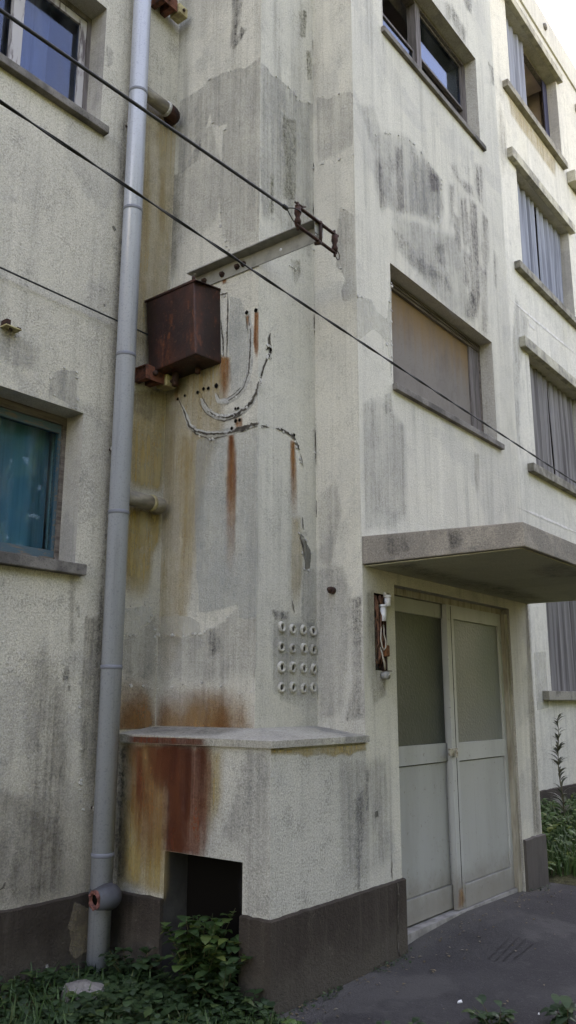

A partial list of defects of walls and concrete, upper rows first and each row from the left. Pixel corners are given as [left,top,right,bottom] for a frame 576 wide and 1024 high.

leakage [451,193,485,316]
crack [177,293,316,468]
corrosion [247,313,258,353]
corrosion [227,420,242,501]
spalling [298,517,312,572]
corrosion [120,696,244,855]